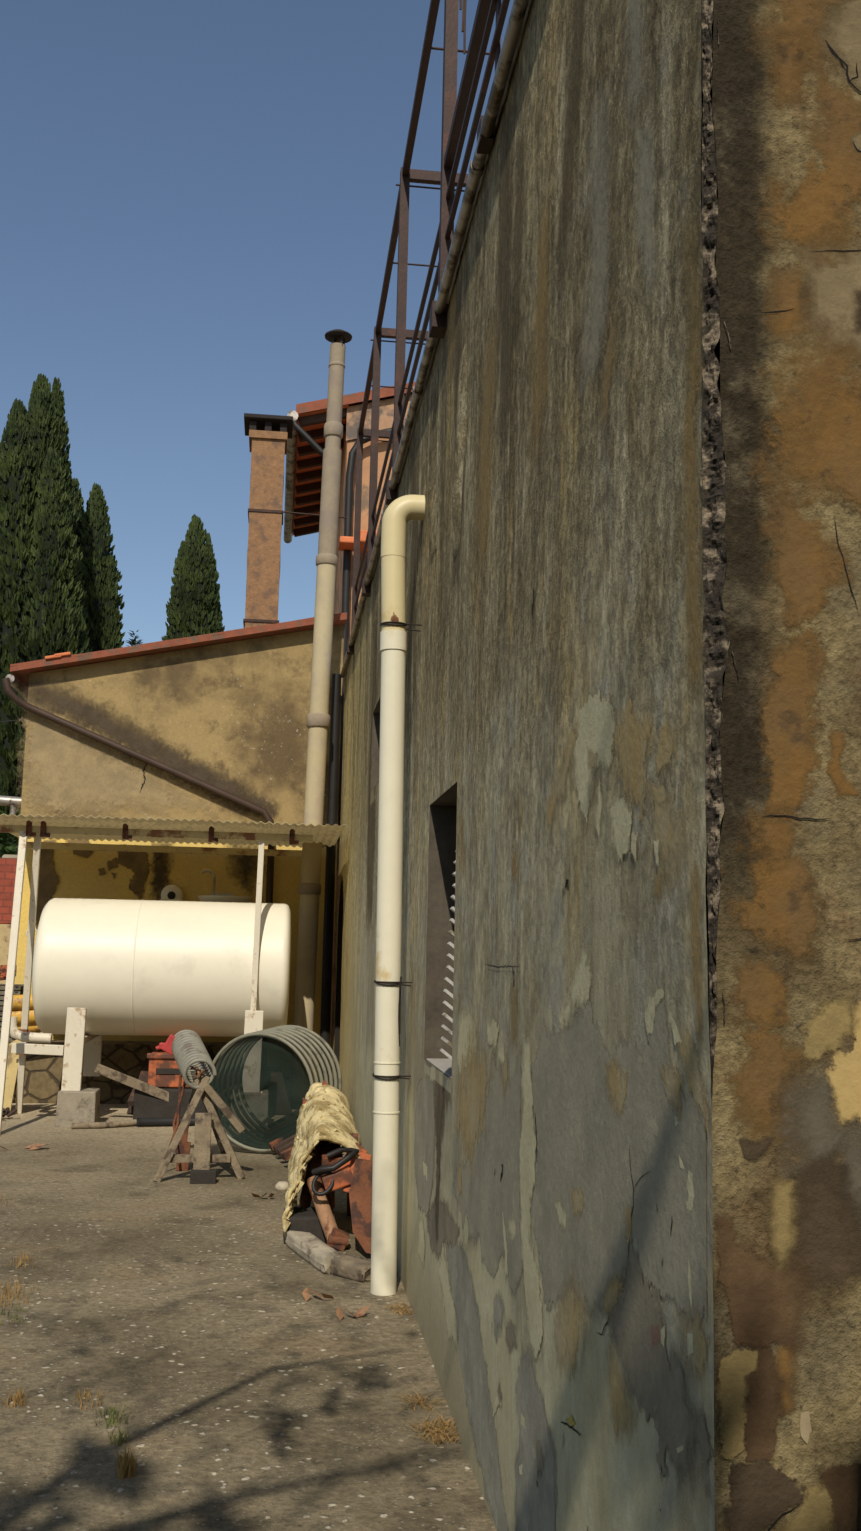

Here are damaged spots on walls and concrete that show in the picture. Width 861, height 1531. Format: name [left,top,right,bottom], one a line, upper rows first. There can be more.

water stain [559,0,584,264]
water stain [499,123,522,424]
water stain [23,710,209,811]
flaking render [414,0,739,1531]
flaking render [36,839,150,929]
peeling [770,1181,796,1266]
water stain [715,1072,861,1462]
flaking render [724,1459,806,1531]
water stain [820,1462,861,1531]